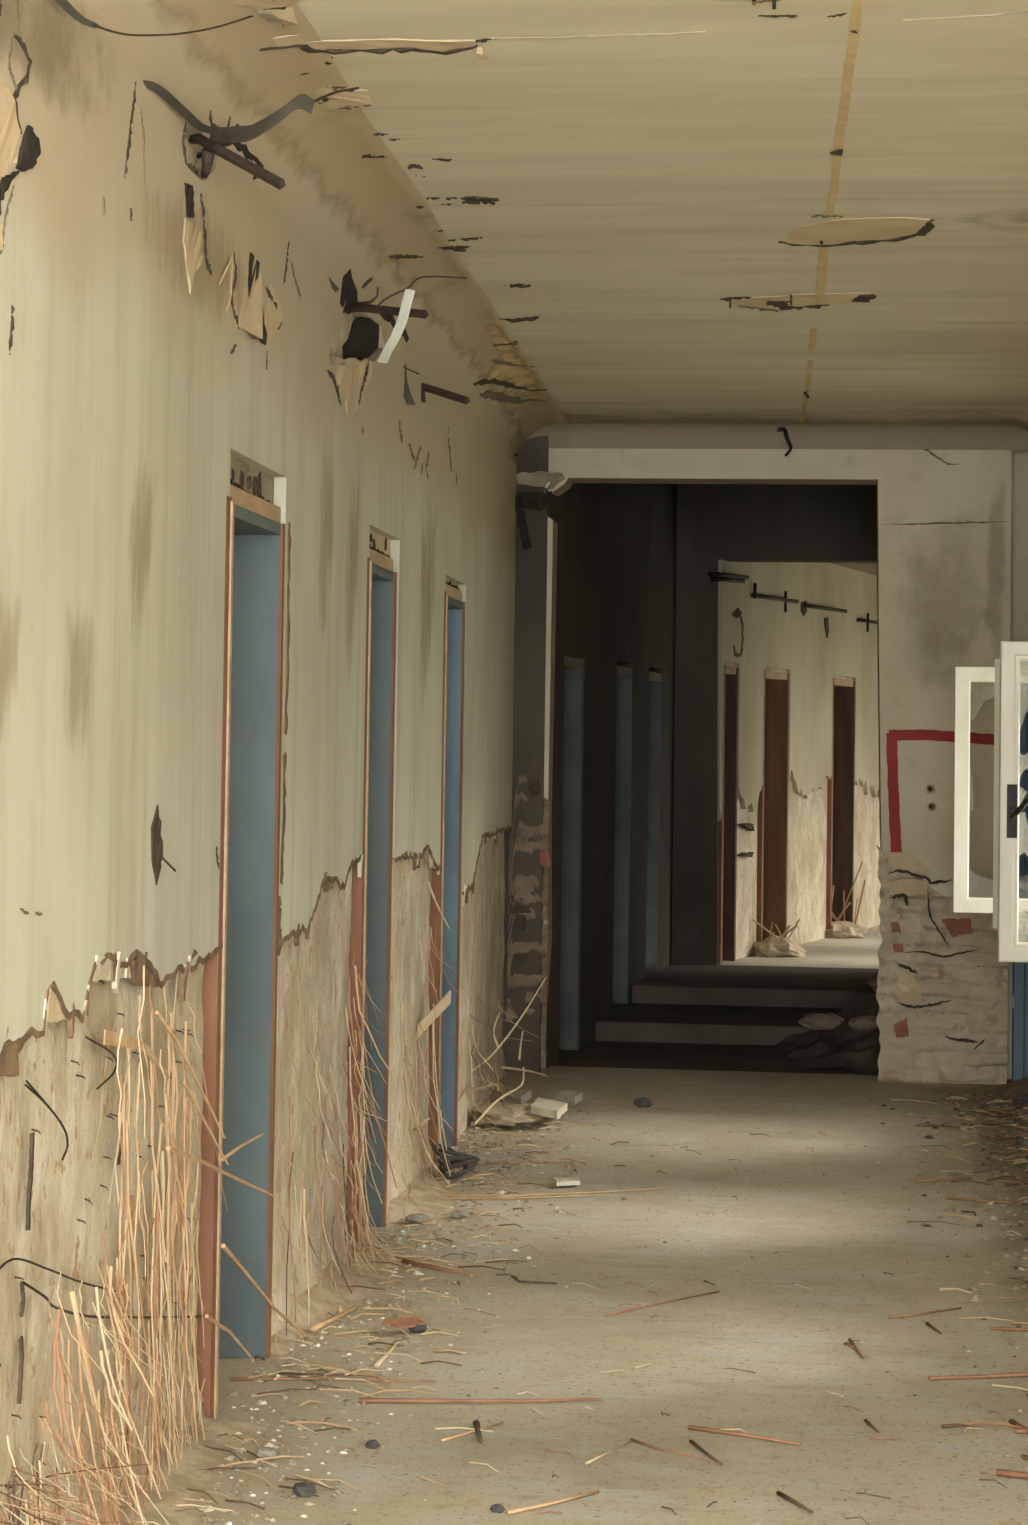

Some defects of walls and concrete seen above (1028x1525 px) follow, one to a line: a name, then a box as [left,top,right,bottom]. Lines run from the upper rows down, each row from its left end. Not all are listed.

crack [259,31,706,60]
crack [903,9,1028,21]
spalling [124,82,145,185]
peeling [162,0,569,439]
spalling [779,214,935,247]
spalling [720,292,876,312]
spalling [398,420,430,479]
spalling [151,805,176,885]
spalling [876,845,1008,1084]
spalling [0,943,223,1525]